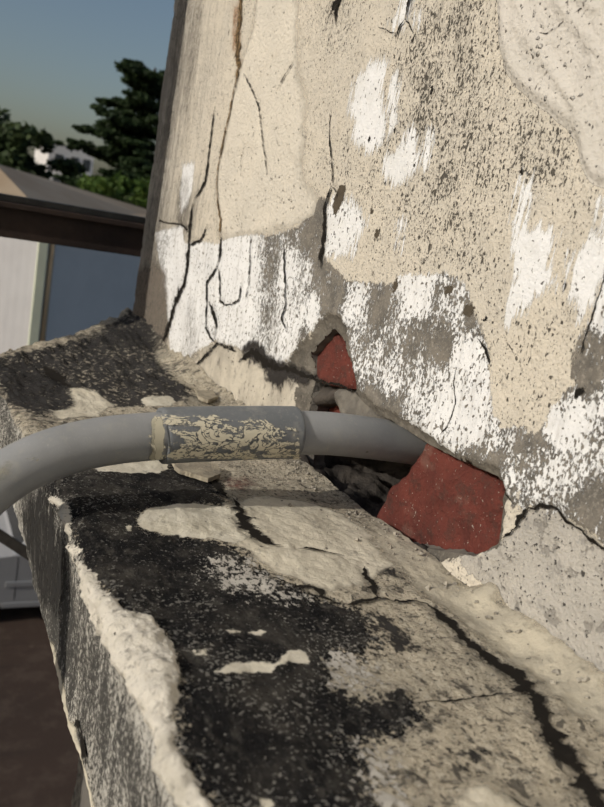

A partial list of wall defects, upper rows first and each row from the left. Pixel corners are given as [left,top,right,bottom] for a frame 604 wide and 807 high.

crack [378,0,414,41]
crack [159,0,355,392]
crack [580,275,604,354]
peeling [155,160,604,672]
crack [503,488,604,549]
peeling [48,495,213,807]
peeling [307,641,389,698]
crack [288,566,604,807]
peeling [348,735,417,807]